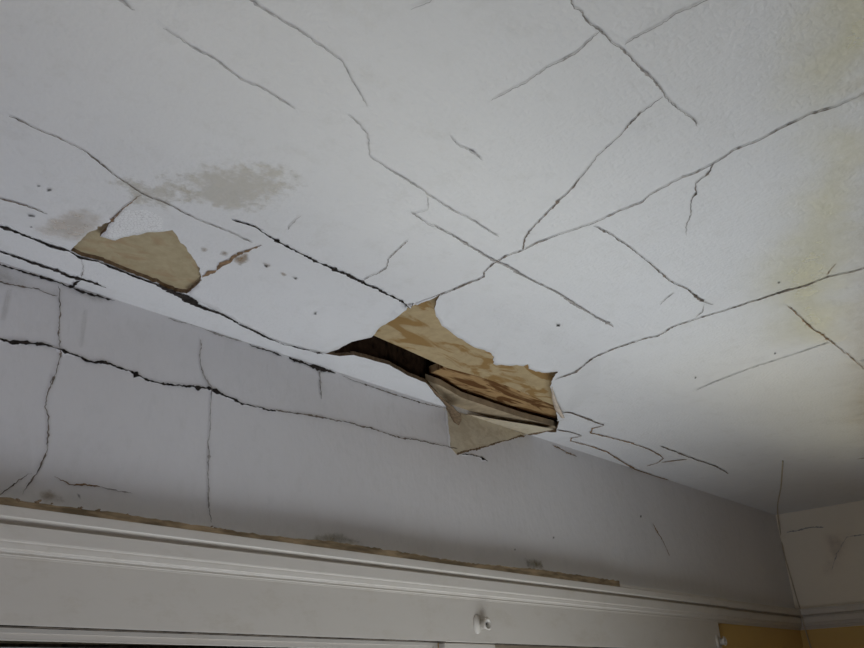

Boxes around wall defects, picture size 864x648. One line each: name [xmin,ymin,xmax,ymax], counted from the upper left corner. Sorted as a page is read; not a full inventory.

crack [163,28,295,109]
peeling [73,206,261,290]
crack [9,116,411,308]
crack [250,0,864,389]
crack [0,224,487,519]
peeling [427,383,553,455]
crack [553,412,728,480]